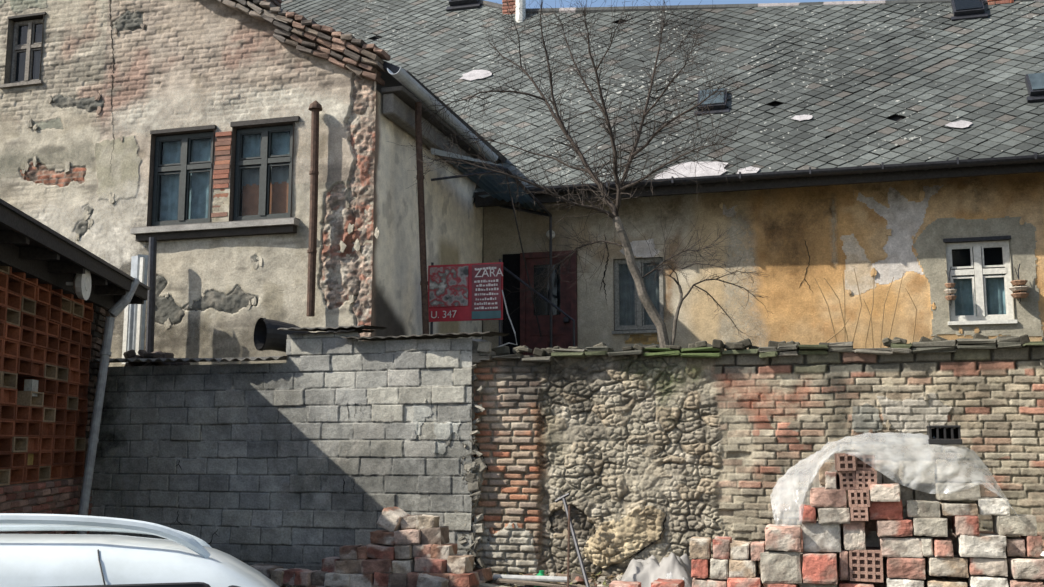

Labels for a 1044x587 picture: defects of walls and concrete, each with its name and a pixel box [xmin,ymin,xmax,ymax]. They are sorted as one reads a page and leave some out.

flaking render [27,90,104,131]
crack [107,0,115,178]
flaking render [19,135,142,240]
flaking render [319,69,380,341]
flaking render [840,185,943,296]
flaking render [155,275,258,329]
flaking render [472,469,538,575]
spalling [546,505,596,541]